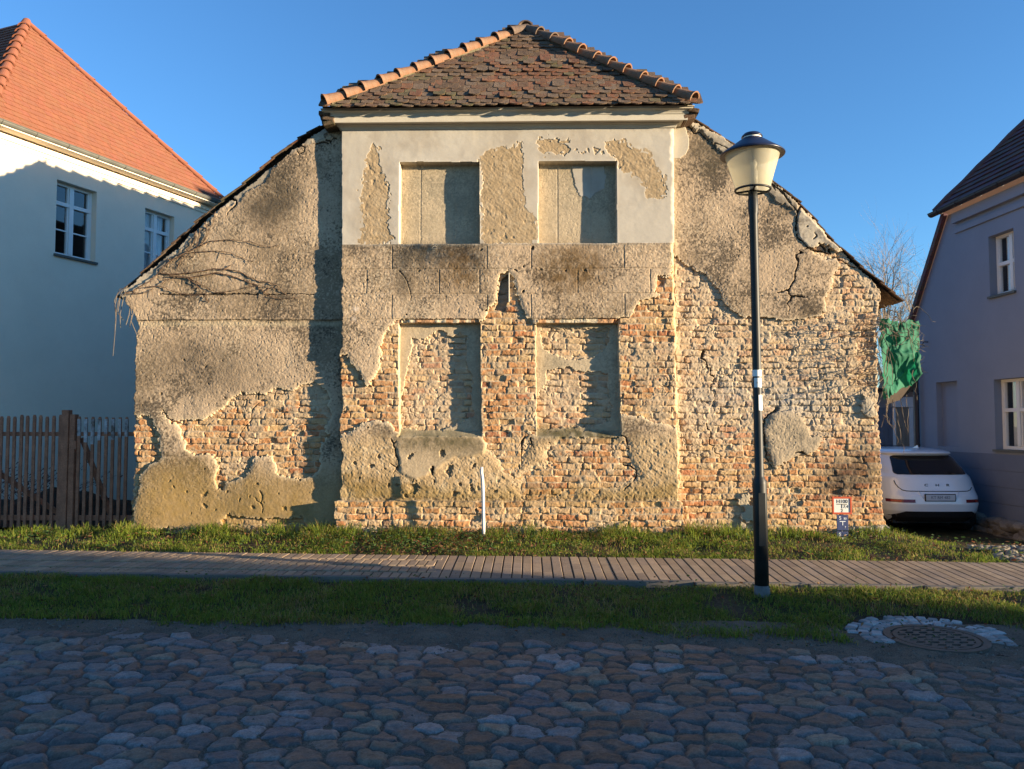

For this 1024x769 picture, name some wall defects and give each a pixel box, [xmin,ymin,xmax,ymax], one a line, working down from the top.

flaking render [357,143,396,244]
flaking render [478,141,539,251]
flaking render [536,134,668,199]
crack [771,183,856,314]
spalling [77,213,889,537]